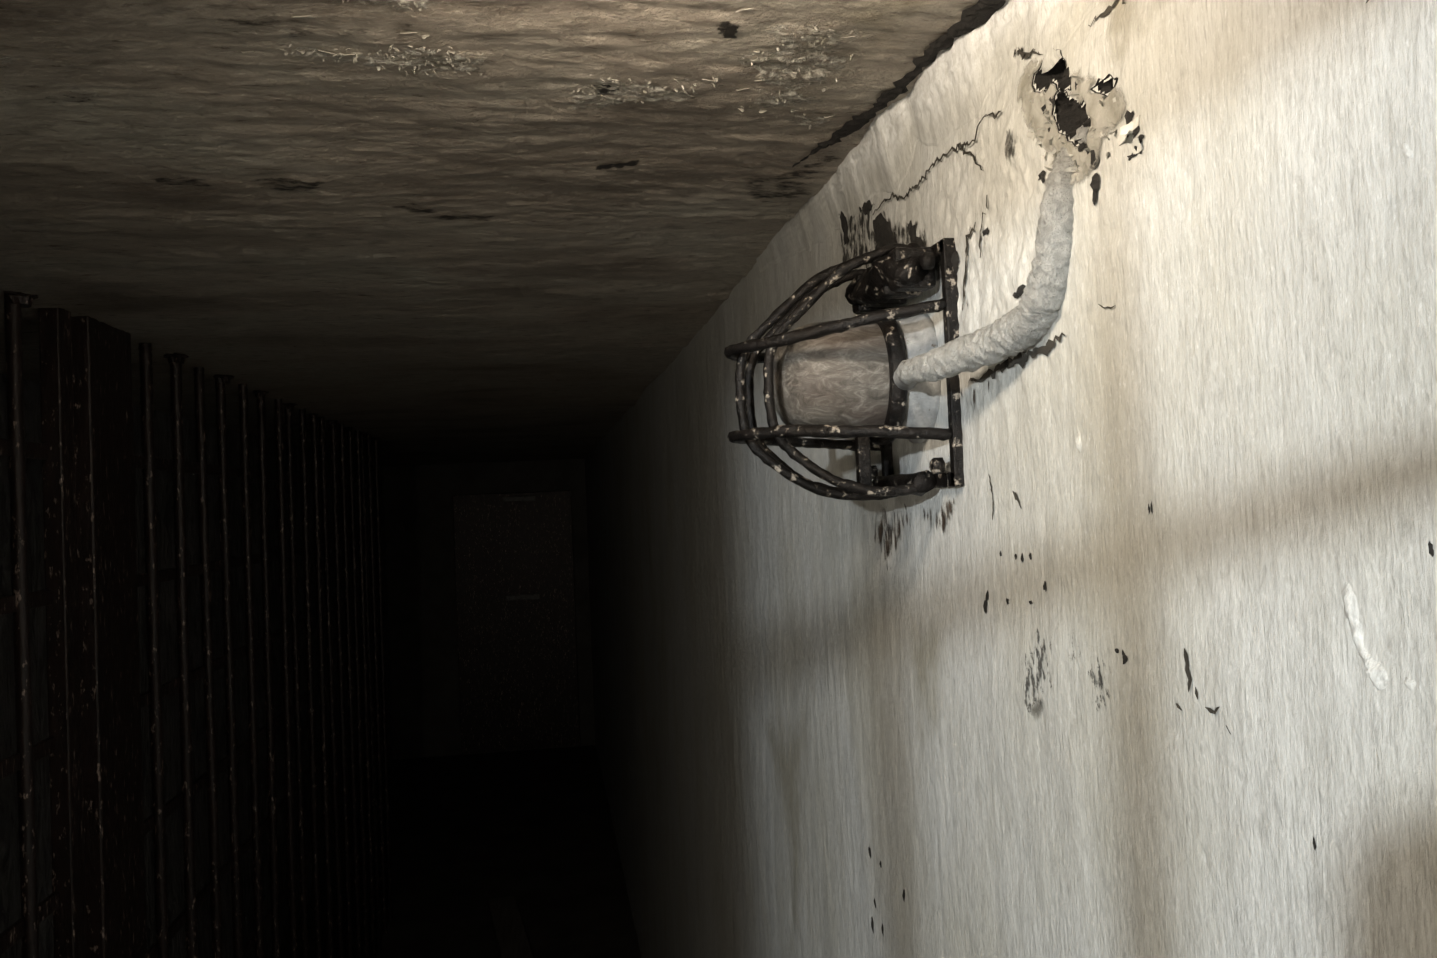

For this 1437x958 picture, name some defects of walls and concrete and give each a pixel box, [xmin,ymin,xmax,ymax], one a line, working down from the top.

crack [1089,0,1125,27]
spalling [1017,48,1145,205]
crack [873,111,1001,310]